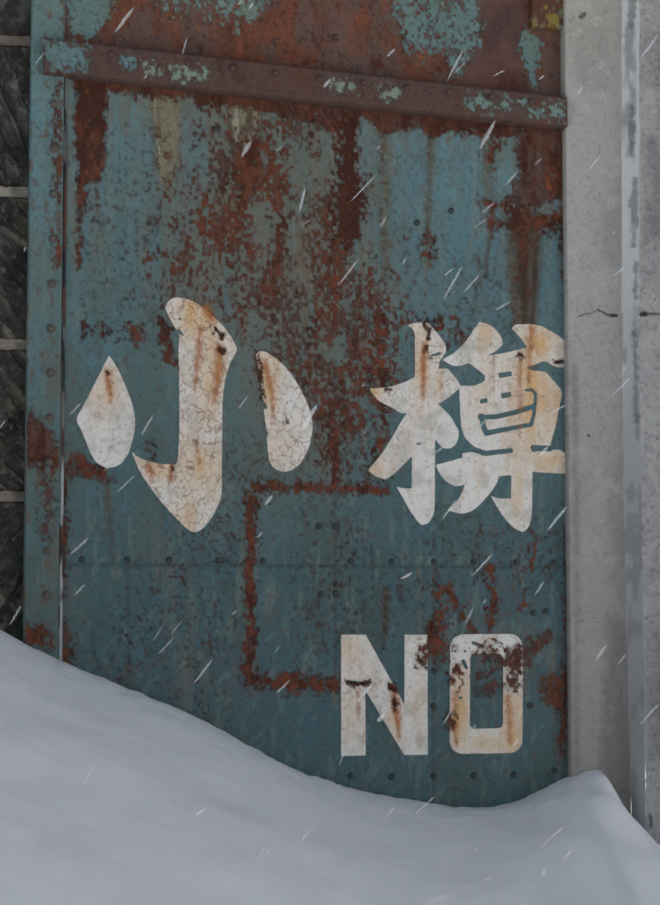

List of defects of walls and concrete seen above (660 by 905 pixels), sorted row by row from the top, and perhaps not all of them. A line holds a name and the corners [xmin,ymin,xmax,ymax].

peeling [118,55,213,86]
peeling [325,77,360,100]
peeling [372,81,403,105]
peeling [379,0,488,80]
peeling [462,89,568,124]
peeling [516,24,545,90]
crack [579,309,660,317]
rust [47,76,568,764]
rust [26,405,122,598]
rust [24,615,77,665]